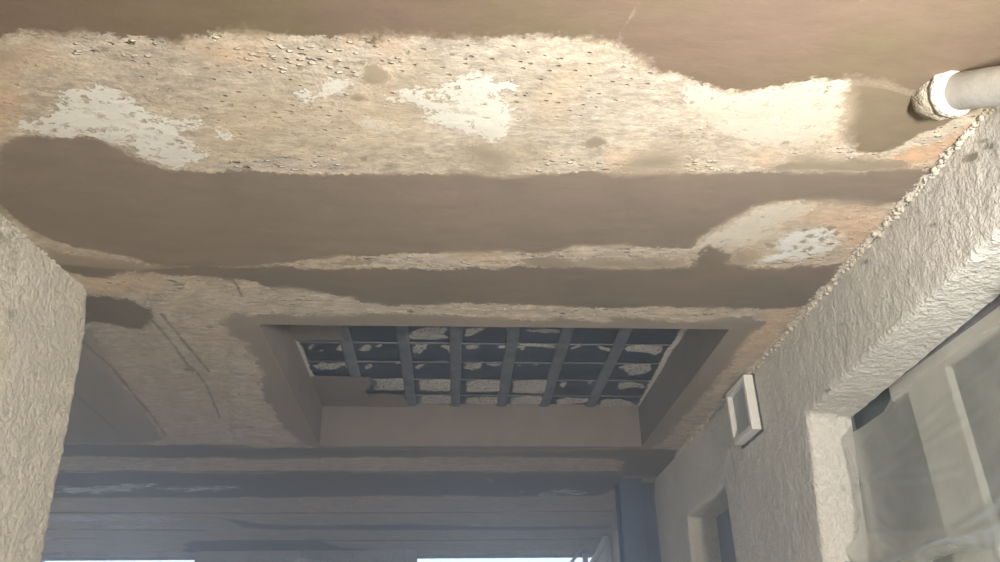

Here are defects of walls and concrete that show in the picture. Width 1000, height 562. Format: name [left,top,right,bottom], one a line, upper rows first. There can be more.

spalling [0,32,191,70]
peeling [16,84,379,175]
spalling [204,33,523,144]
spalling [237,79,999,458]
crack [149,313,220,418]
spalling [225,342,302,445]
peeling [54,483,241,494]
spalling [59,456,622,479]